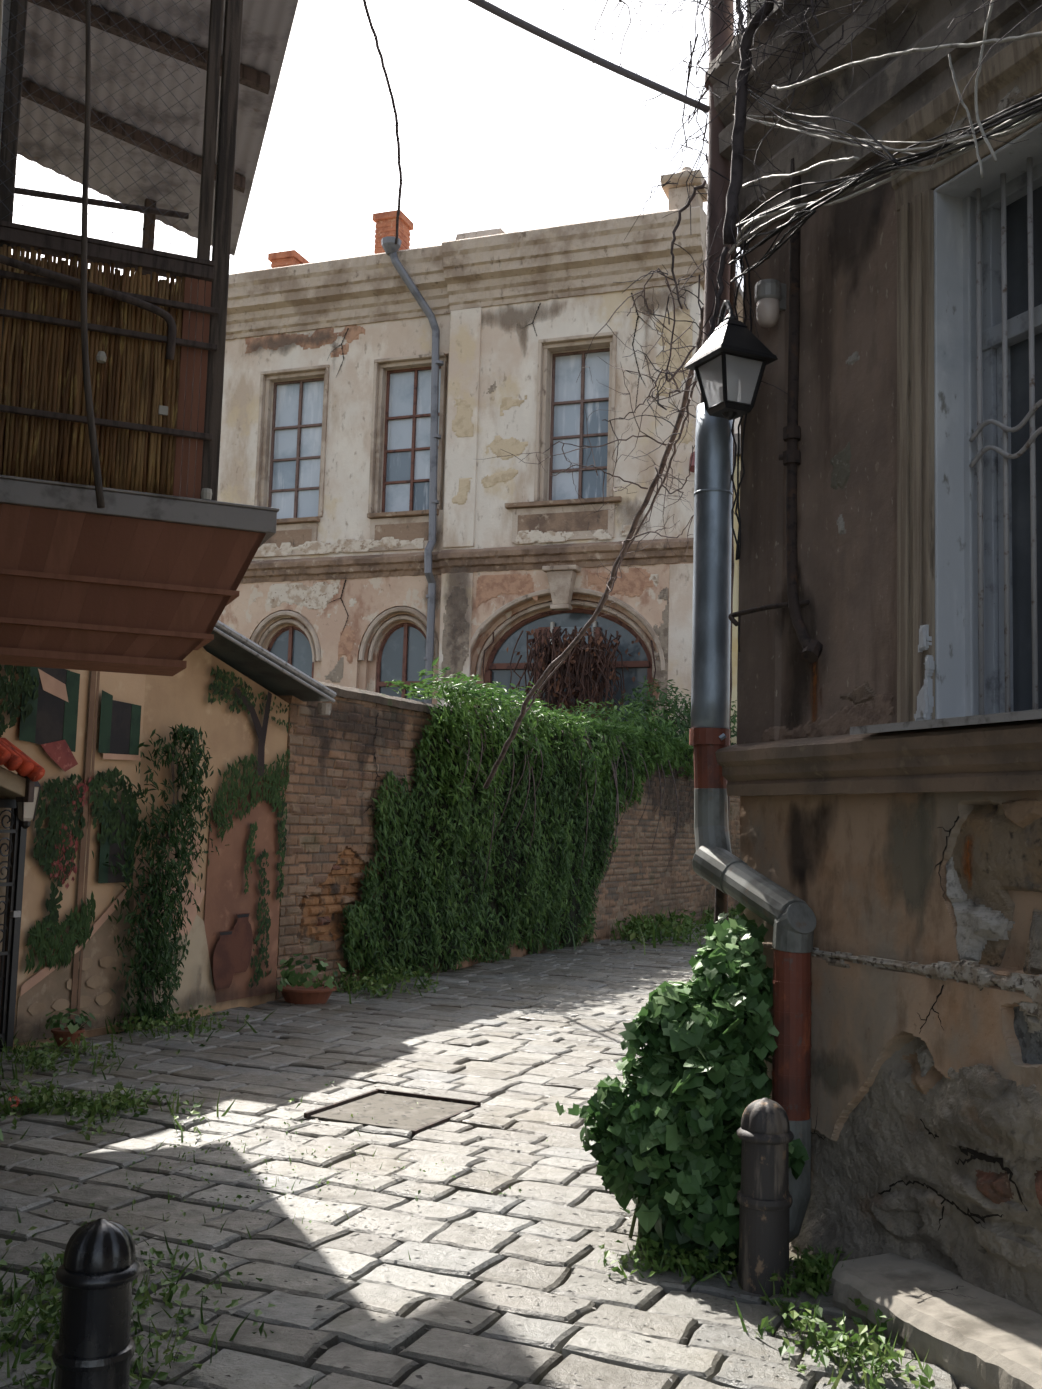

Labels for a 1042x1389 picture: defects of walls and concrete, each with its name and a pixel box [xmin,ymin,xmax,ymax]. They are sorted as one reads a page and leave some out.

flaking render [245,325,365,358]
flaking render [452,398,474,438]
flaking render [486,381,527,416]
flaking render [452,435,528,505]
crack [330,579,348,635]
spalling [296,848,373,942]
damp [790,808,829,882]
damp [889,803,935,924]
flaking render [811,798,1042,1064]
crack [934,816,959,899]
crack [919,985,944,1034]
flaking render [789,1037,1042,1315]